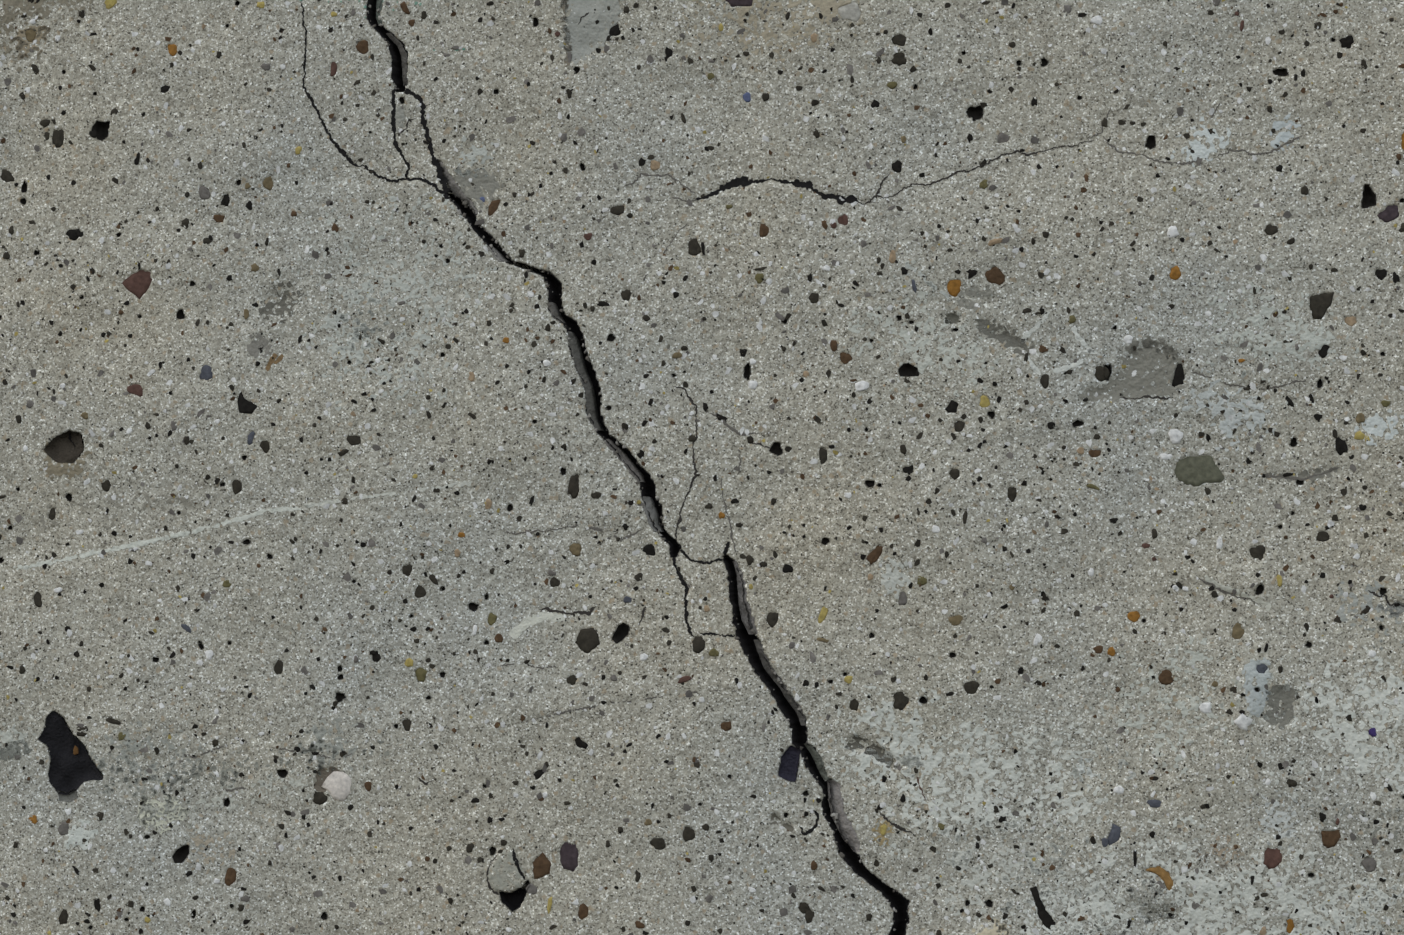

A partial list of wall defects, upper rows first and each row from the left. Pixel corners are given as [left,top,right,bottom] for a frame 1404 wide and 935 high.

crack [279,748,353,760]
crack [301,0,912,935]